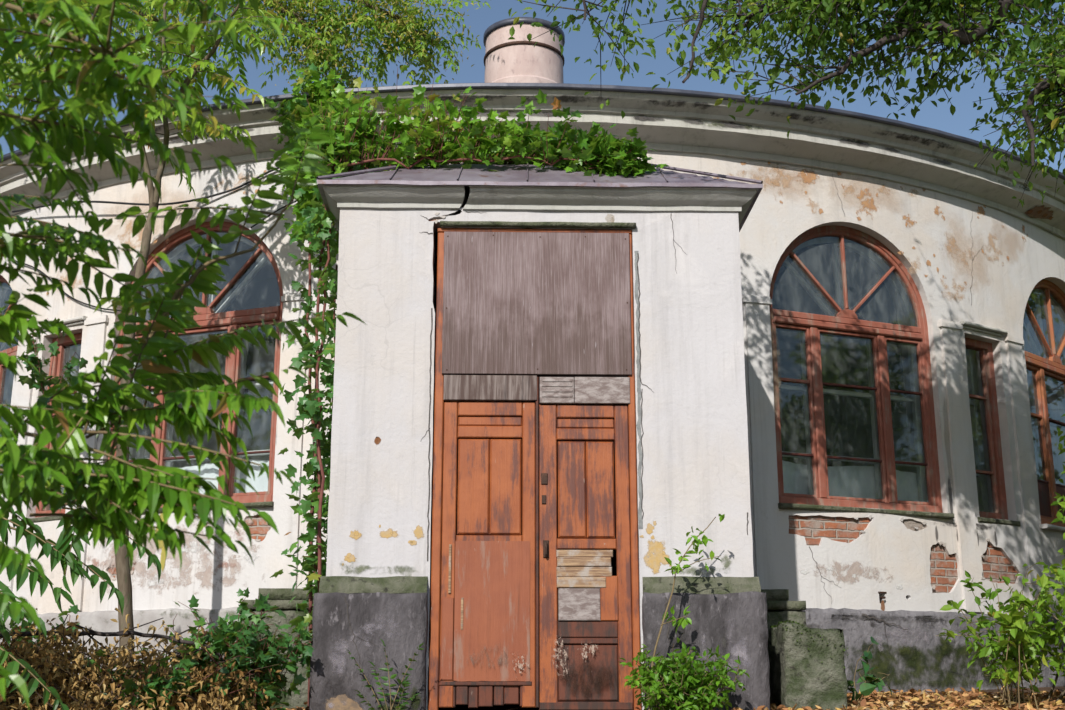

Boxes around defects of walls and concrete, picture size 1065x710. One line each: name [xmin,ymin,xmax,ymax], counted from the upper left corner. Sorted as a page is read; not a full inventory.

crack [422,186,486,234]
peeling [758,162,823,214]
peeling [837,172,885,221]
flaking render [89,544,117,586]
flaking render [129,513,271,594]
peeling [379,525,424,545]
peeling [640,521,671,574]
spalling [789,515,872,546]
flaking render [900,517,926,531]
spalling [930,541,958,593]
spalling [981,538,1018,584]